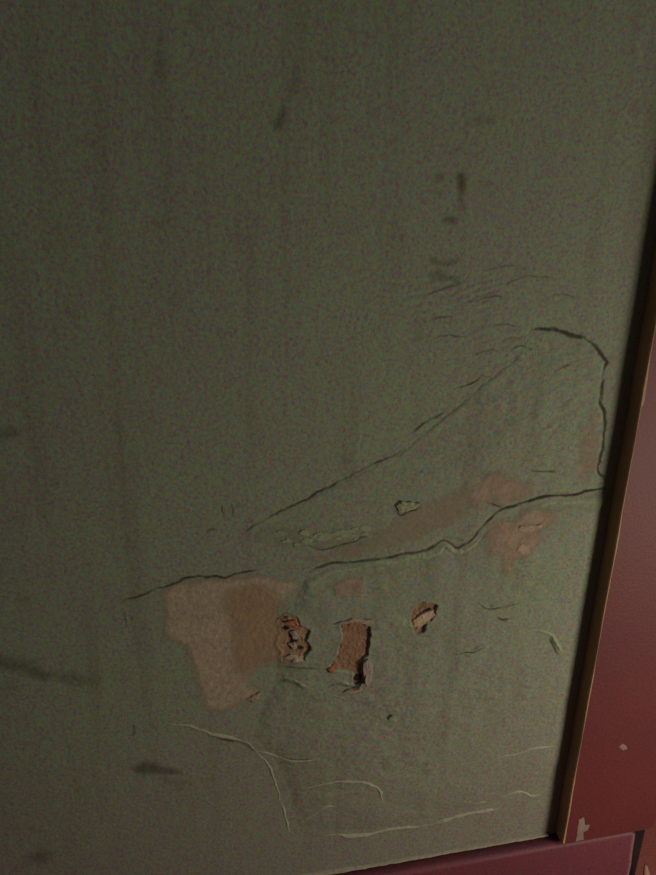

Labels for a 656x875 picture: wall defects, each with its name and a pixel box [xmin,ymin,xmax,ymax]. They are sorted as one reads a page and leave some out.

crack [306,328,609,595]
crack [288,483,337,509]
crack [132,571,251,598]
spalling [411,602,436,633]
peeling [164,577,310,711]
spalling [327,618,373,694]
peeling [576,817,590,841]